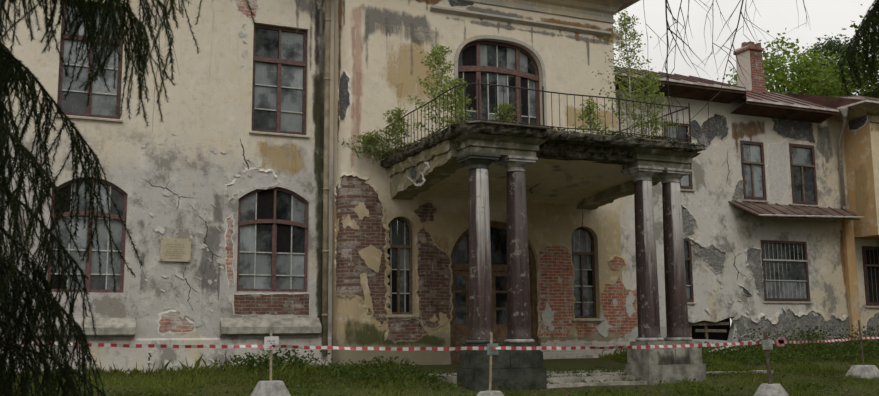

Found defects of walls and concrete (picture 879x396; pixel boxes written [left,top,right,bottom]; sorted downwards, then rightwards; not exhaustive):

flaking render [224,161,281,202]
water stain [296,0,325,337]
flaking render [338,68,352,122]
water stain [365,0,441,99]
flaking render [686,112,729,151]
flaking render [143,196,310,336]
flaking render [334,172,392,328]
flaking render [411,200,454,331]
flaking render [537,243,638,359]
flaking render [681,204,728,276]
flaking render [738,247,764,301]
flaking render [731,304,850,346]